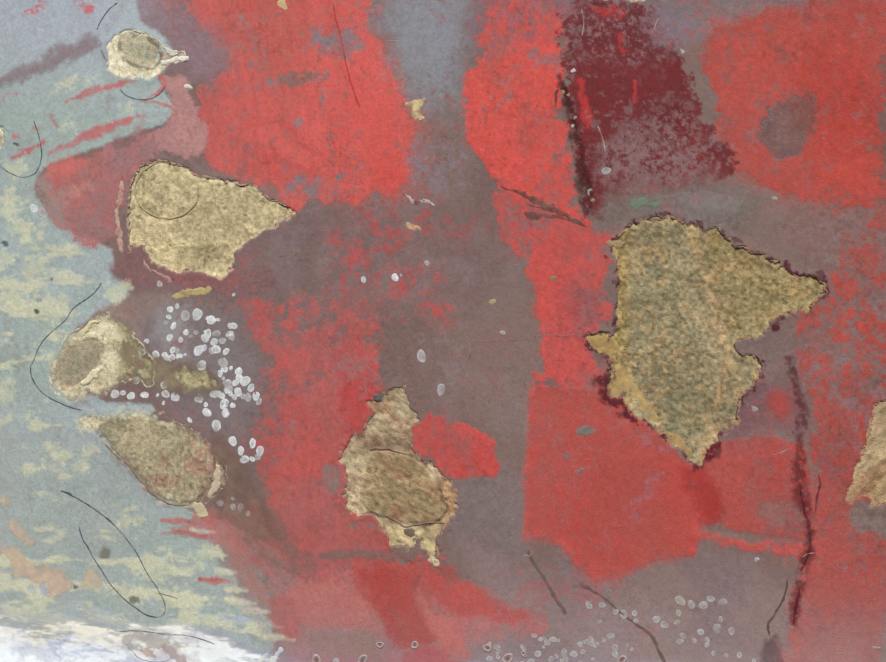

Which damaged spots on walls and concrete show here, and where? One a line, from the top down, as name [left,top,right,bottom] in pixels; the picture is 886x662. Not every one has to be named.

spalling [107,29,189,80]
spalling [114,159,296,300]
spalling [49,312,155,402]
spalling [78,409,228,518]
spalling [172,366,217,389]
spalling [339,384,458,567]
peeling [576,425,595,436]
spalling [585,214,828,466]
spalling [845,401,886,508]
crack [528,552,566,614]
crack [584,587,666,662]
crack [767,475,822,635]